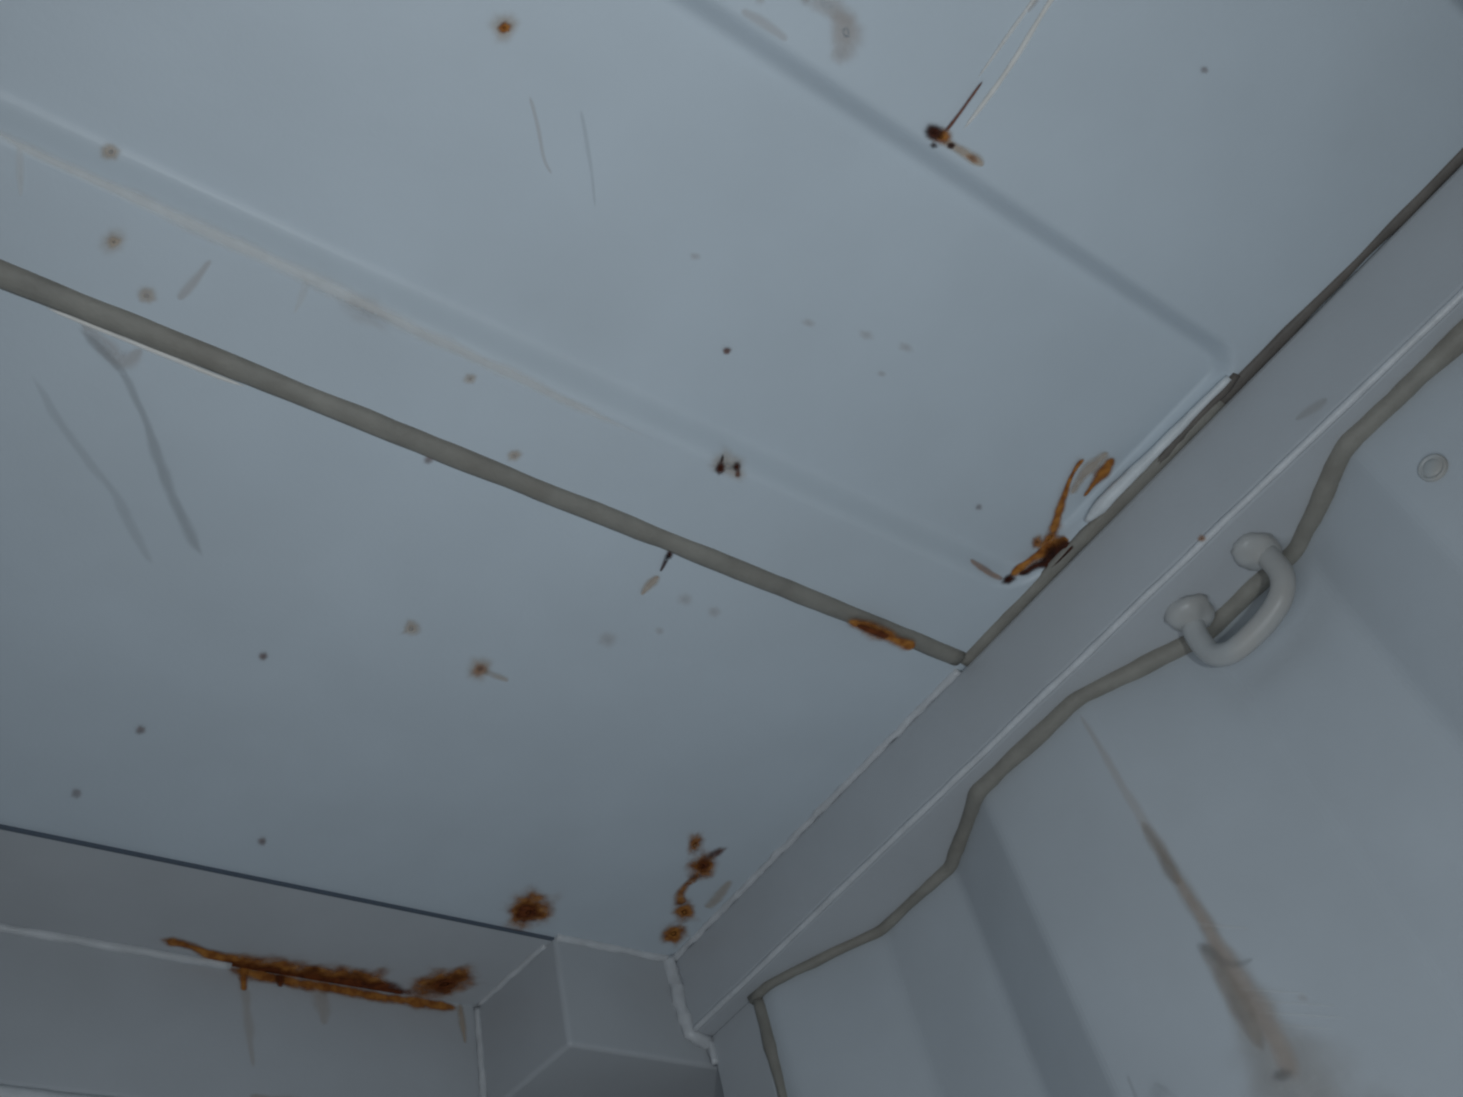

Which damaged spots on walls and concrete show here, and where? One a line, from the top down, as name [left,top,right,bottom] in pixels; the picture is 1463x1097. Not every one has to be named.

rust [849,620,915,650]
rust [510,893,550,926]
rust [663,836,723,943]
rust [164,939,471,1010]